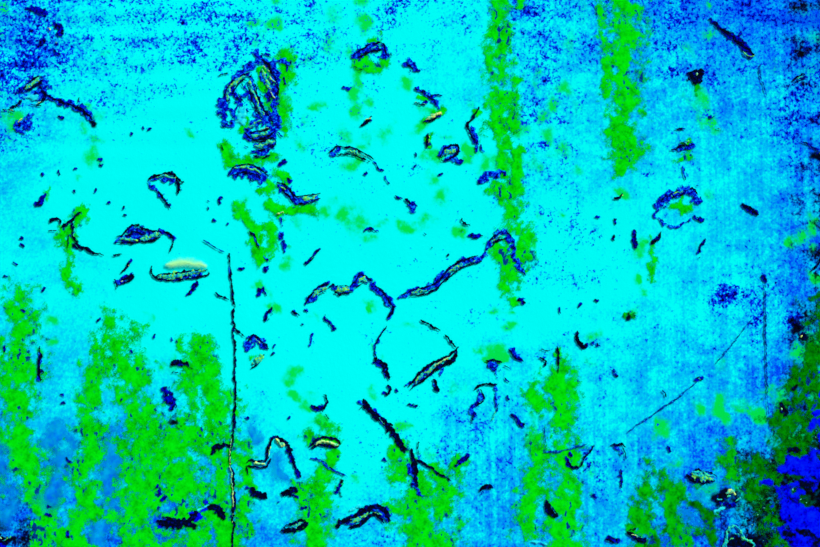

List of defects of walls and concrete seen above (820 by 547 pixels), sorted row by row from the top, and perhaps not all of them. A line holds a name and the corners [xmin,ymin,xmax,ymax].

peeling [351,30,392,75]
peeling [402,57,421,72]
crack [41,94,97,127]
peeling [215,48,321,253]
peeling [114,206,176,252]
peeling [114,258,135,288]
crack [203,240,244,547]
crack [357,306,456,497]
water stain [42,420,78,506]
water stain [90,426,124,547]